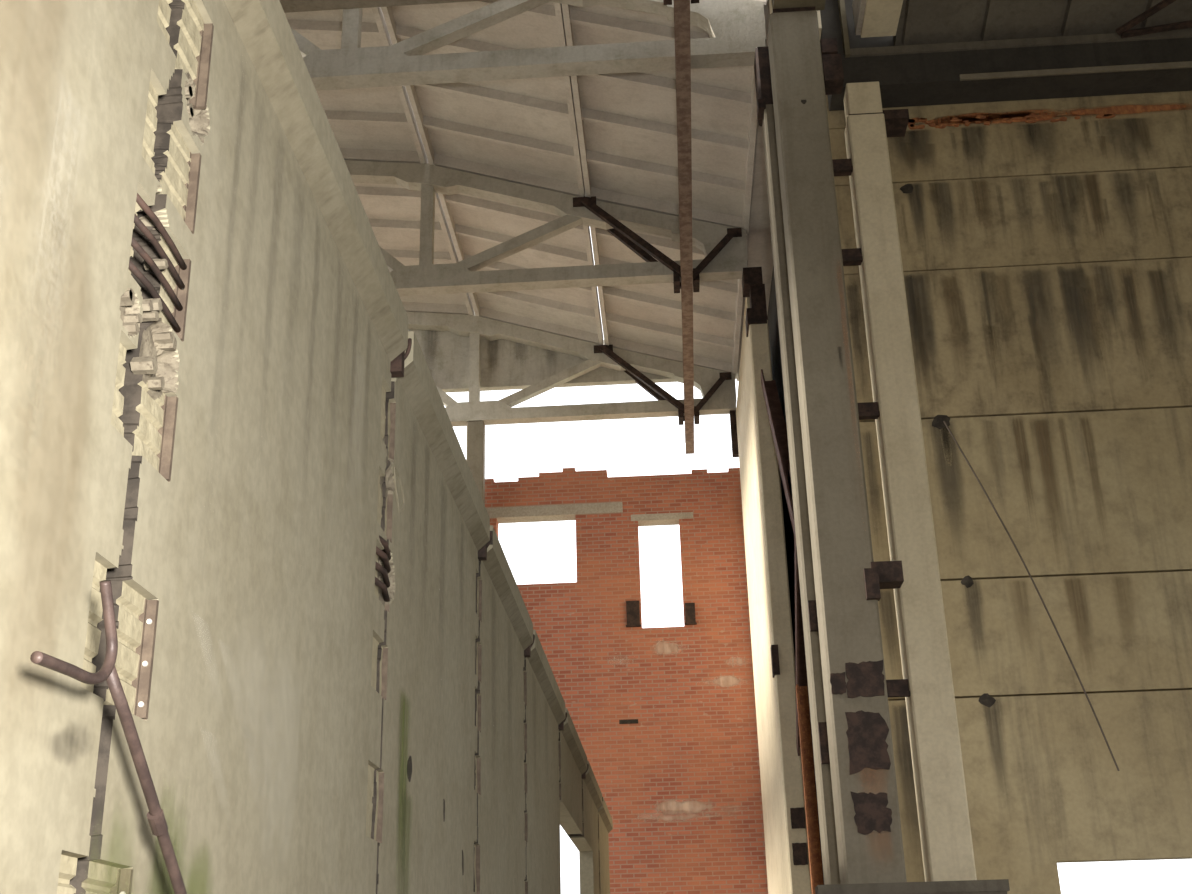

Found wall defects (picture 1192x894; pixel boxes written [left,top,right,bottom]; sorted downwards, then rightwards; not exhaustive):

spalling [185,72,210,143]
rust [908,104,1188,129]
water stain [909,184,923,219]
spalling [119,193,187,400]
water stain [905,276,932,347]
crack [69,0,185,894]
crack [381,381,405,551]
crack [371,610,387,894]
water stain [399,698,407,840]
crack [462,531,493,892]
water stain [895,707,913,792]